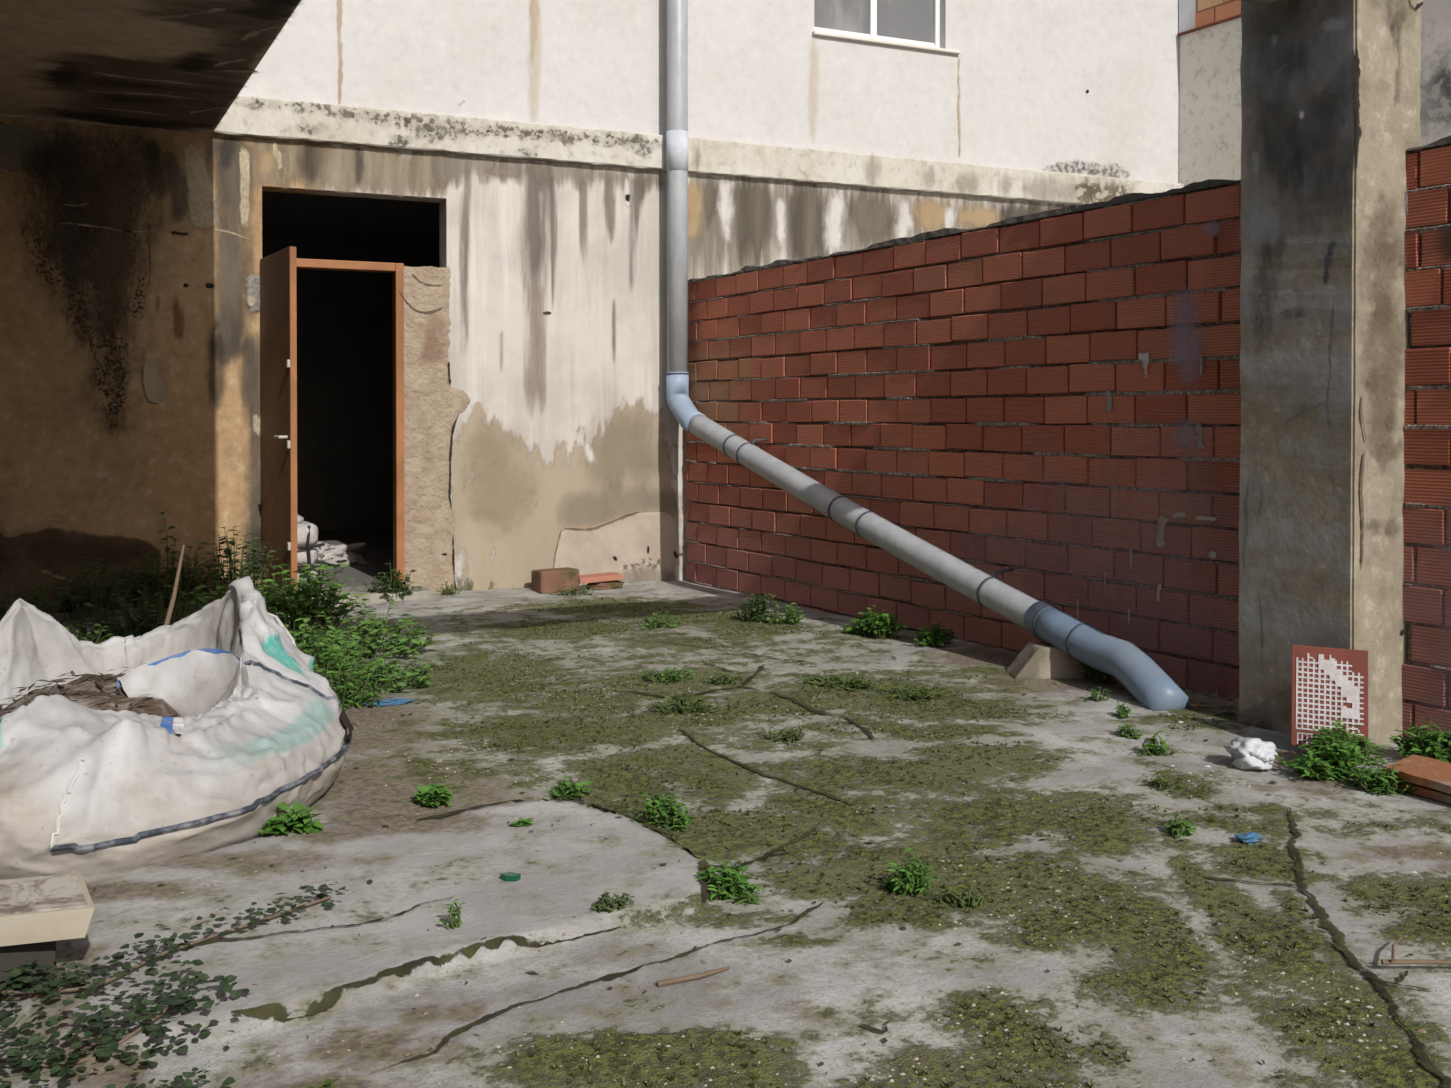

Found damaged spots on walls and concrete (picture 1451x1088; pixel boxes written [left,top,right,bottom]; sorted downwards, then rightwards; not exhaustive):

leakage [1420,70,1451,122]
leakage [22,0,663,573]
peeling [553,511,678,585]
crack [416,639,875,903]
crack [82,897,452,974]
crack [231,927,620,1022]
crack [364,901,825,1076]
crack [861,1021,890,1033]
crack [1205,808,1451,1088]